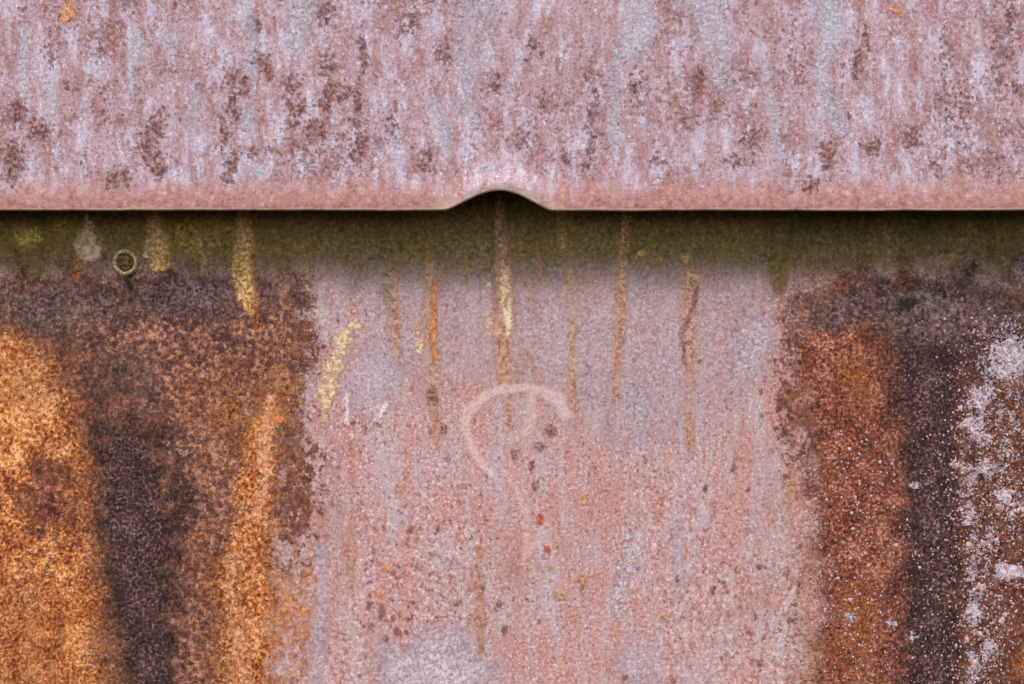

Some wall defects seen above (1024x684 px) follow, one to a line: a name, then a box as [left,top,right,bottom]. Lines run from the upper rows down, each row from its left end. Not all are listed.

corrosion [0,93,62,188]
corrosion [214,8,371,186]
corrosion [925,0,1024,174]
damp [10,211,46,284]
damp [73,214,102,281]
damp [143,211,172,272]
damp [231,211,261,339]
damp [768,213,788,294]
corrosion [0,260,364,684]
corrosion [770,260,935,684]
damp [790,211,1024,684]
corrosion [939,335,1024,684]